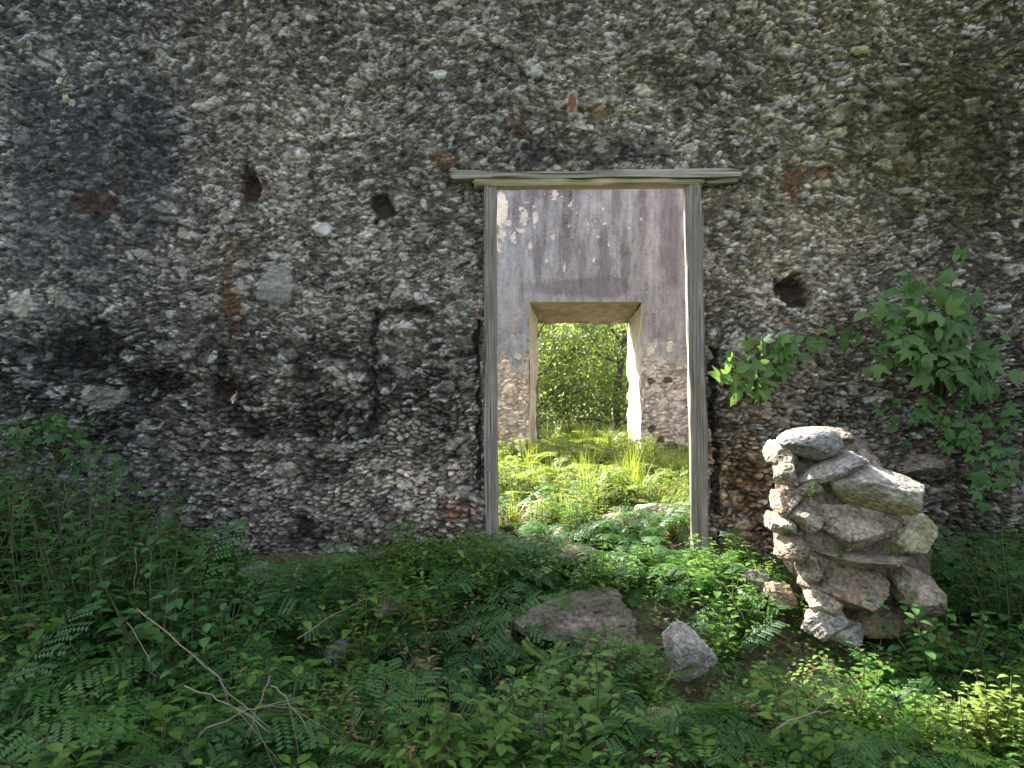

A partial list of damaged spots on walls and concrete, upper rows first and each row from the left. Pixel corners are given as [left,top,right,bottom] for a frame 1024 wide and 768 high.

flaking render [497,190,577,260]
spalling [497,352,529,456]
spalling [641,340,689,457]